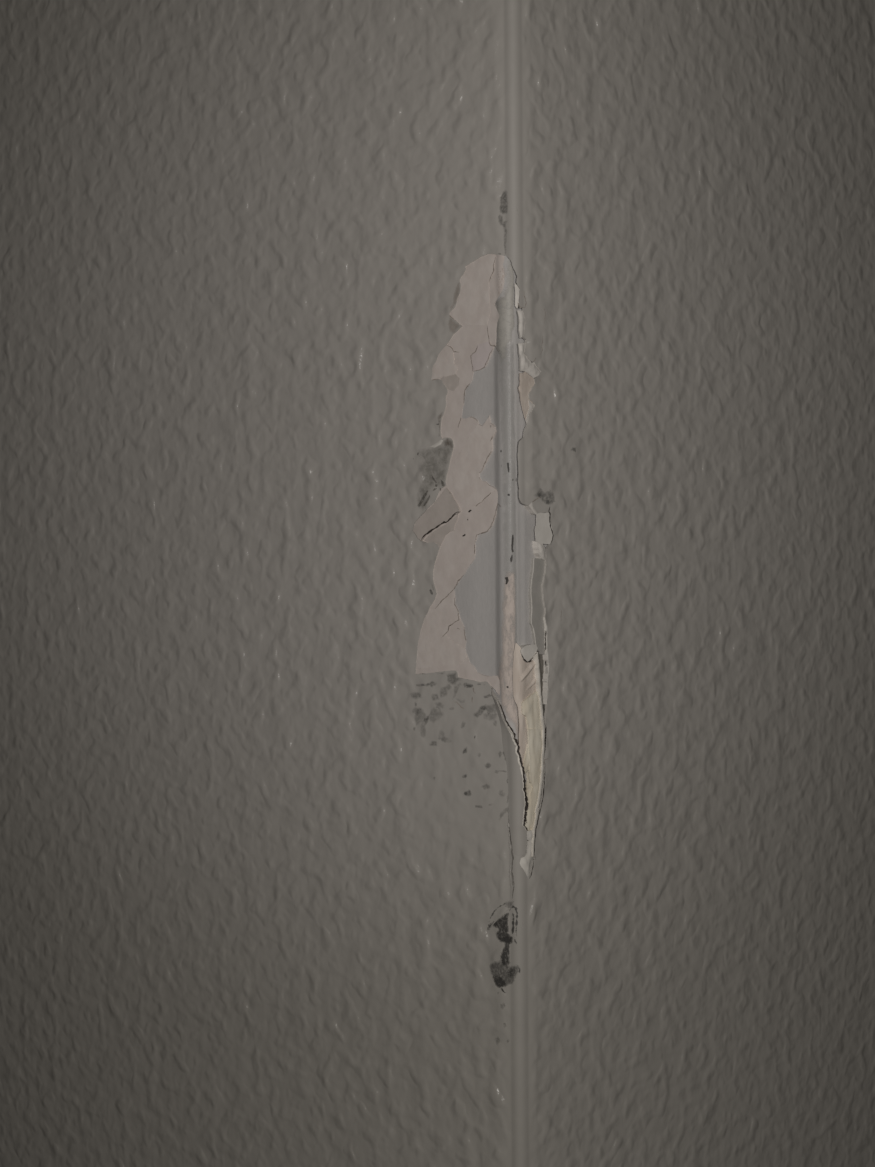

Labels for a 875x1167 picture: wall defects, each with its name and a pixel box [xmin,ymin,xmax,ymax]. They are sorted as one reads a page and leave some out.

peeling [413,254,553,879]
crack [490,685,528,899]